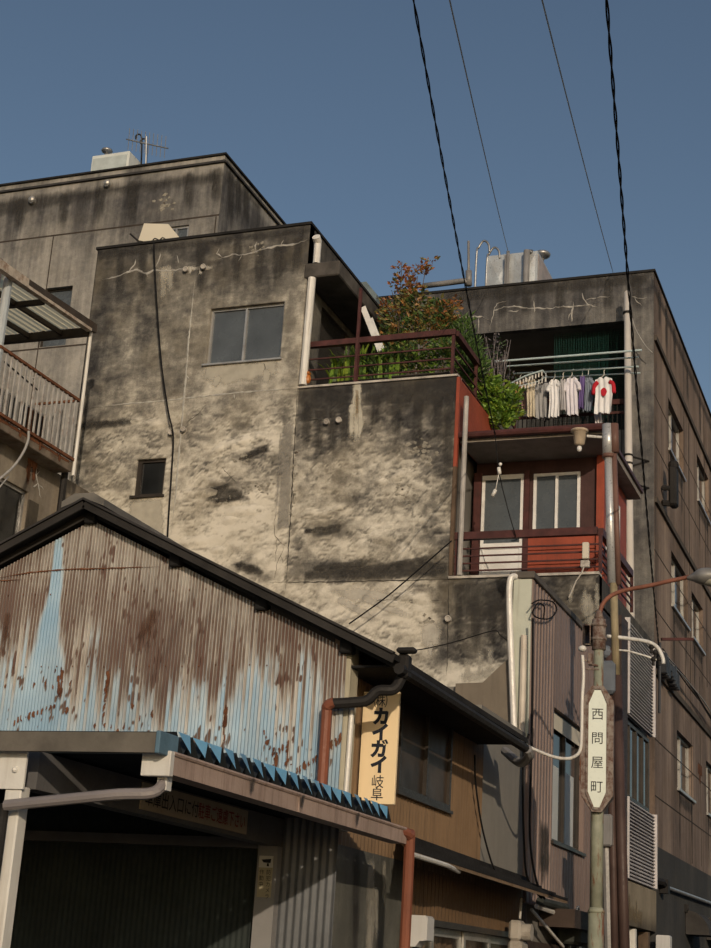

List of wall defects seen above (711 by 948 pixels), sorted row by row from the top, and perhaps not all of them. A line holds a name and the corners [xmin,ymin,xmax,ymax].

leakage [0,170,256,223]
crack [214,240,306,261]
crack [459,294,605,333]
leakage [302,382,454,464]
crack [85,254,450,665]
leakage [305,525,340,536]
rust [13,667,77,726]
rust [93,669,125,731]
leakage [354,858,385,948]